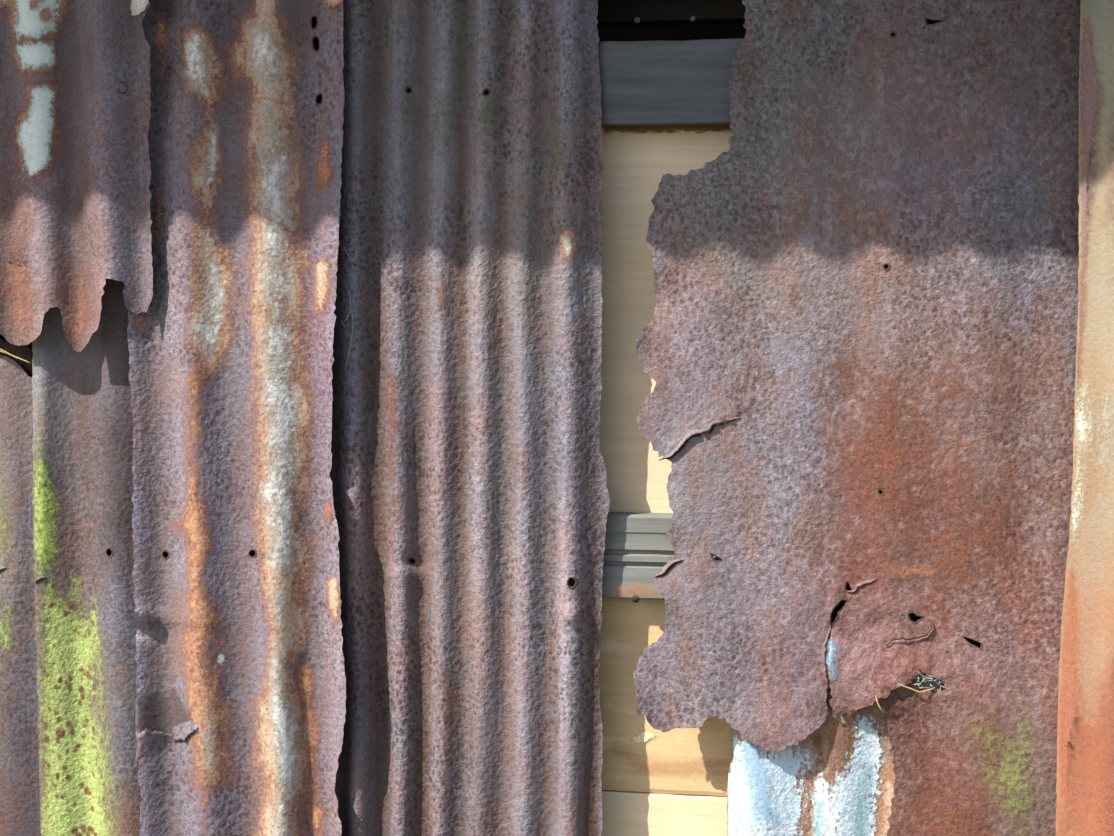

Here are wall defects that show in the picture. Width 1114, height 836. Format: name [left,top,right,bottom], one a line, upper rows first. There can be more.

peeling [1,0,61,70]
peeling [17,85,55,176]
rust [1077,22,1101,388]
rust [0,0,273,836]
rust [275,0,610,836]
crack [658,417,740,460]
crack [846,579,877,593]
rust [889,563,934,578]
crack [882,619,936,650]
peeling [729,715,884,836]
rust [800,721,855,836]
rust [876,778,895,836]